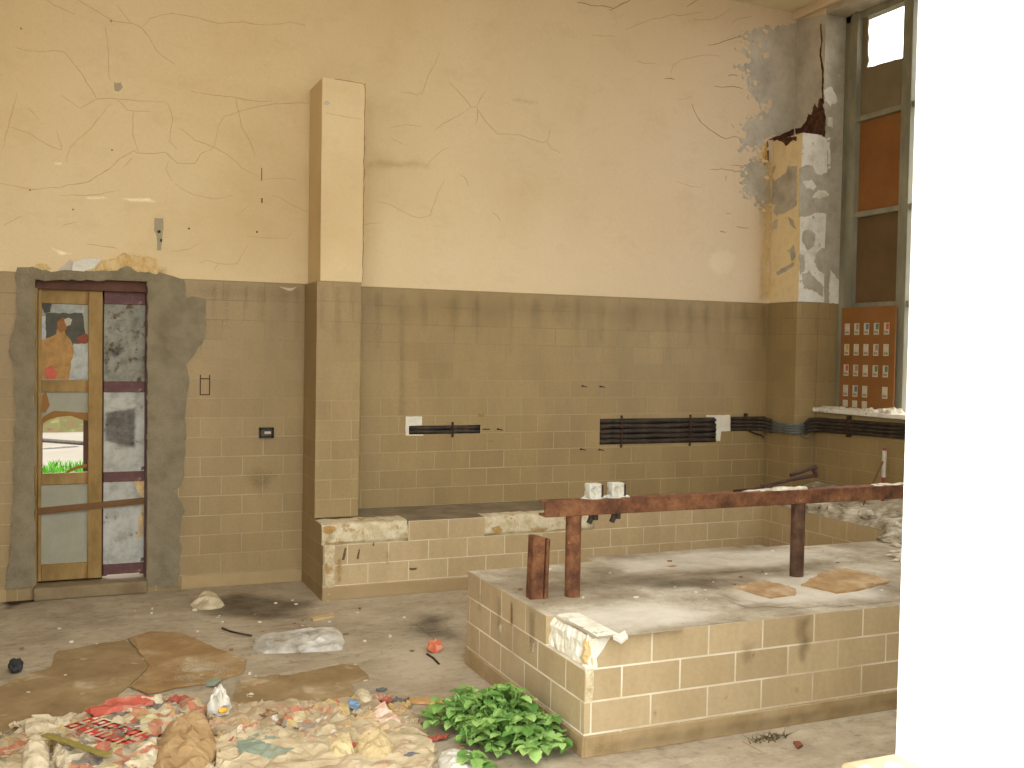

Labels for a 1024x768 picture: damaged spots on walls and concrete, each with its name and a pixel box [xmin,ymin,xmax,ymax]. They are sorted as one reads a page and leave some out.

crack [577,0,752,139]
crack [0,0,306,270]
crack [329,52,560,282]
peeling [732,14,839,304]
spalling [34,252,159,274]
spalling [315,515,408,601]
spalling [478,510,566,535]
spalling [581,515,594,530]
spalling [549,612,628,703]